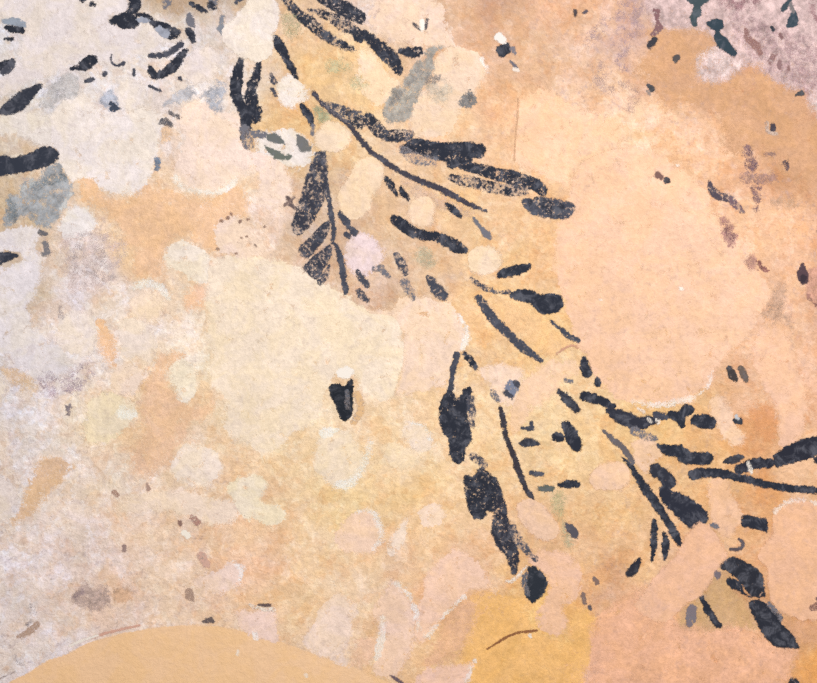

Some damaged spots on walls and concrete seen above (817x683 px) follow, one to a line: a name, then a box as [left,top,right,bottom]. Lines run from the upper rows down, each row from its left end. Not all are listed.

flaking render [165,0,225,21]
flaking render [77,177,255,281]
peeling [328,365,365,425]
crack [486,629,538,650]